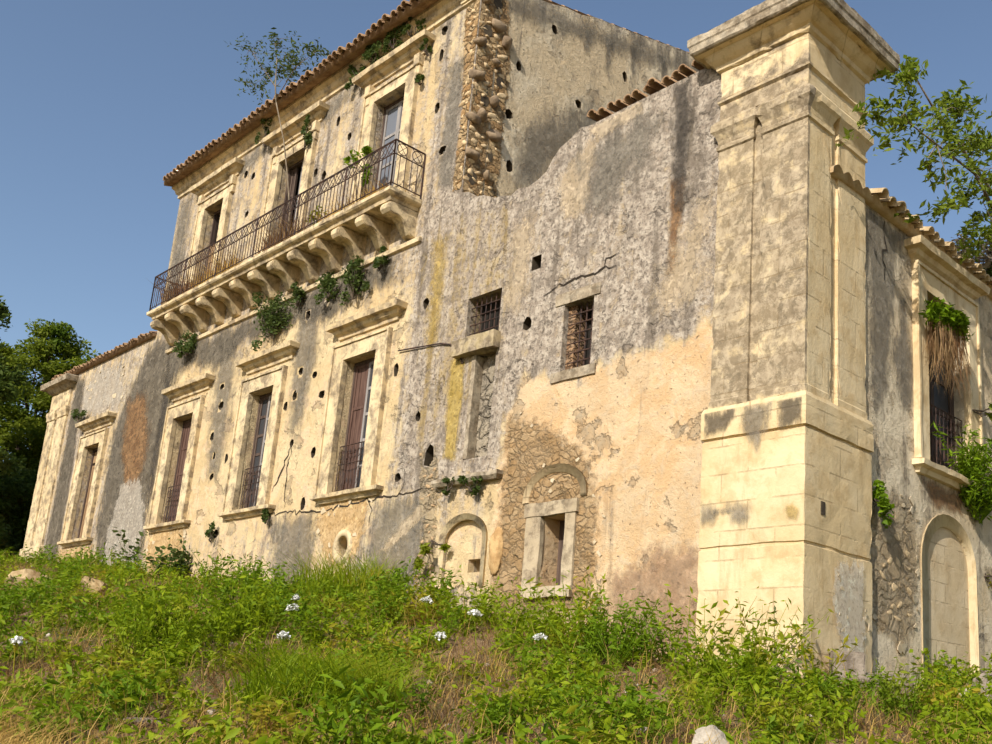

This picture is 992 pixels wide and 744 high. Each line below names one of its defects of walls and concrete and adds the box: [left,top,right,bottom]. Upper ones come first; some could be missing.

spalling [439,0,521,197]
damp [510,0,699,210]
crack [543,252,619,296]
crack [881,221,889,280]
damp [866,211,913,408]
damp [97,258,395,566]
crack [271,446,433,526]
spalling [492,412,606,619]
spalling [832,489,920,654]